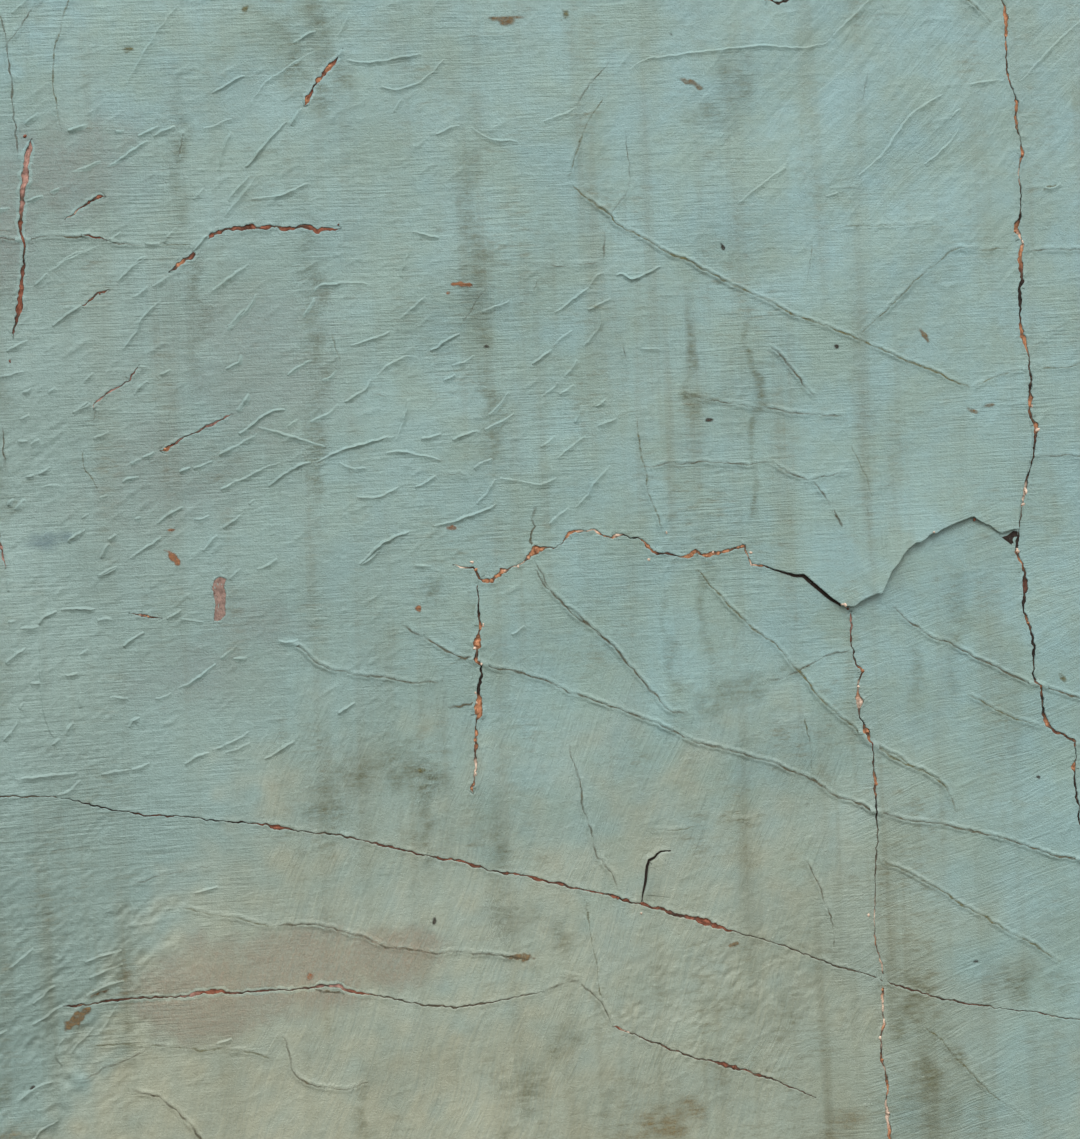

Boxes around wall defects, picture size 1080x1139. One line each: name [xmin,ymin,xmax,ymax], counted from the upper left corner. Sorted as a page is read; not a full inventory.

crack [757,0,804,9]
crack [301,48,344,107]
crack [0,13,125,363]
crack [169,219,342,273]
crack [572,137,746,291]
crack [778,306,988,384]
crack [91,365,140,410]
crack [160,412,233,454]
crack [910,0,1080,885]
peeling [210,574,229,625]
crack [408,516,782,794]
crack [0,609,1080,1139]